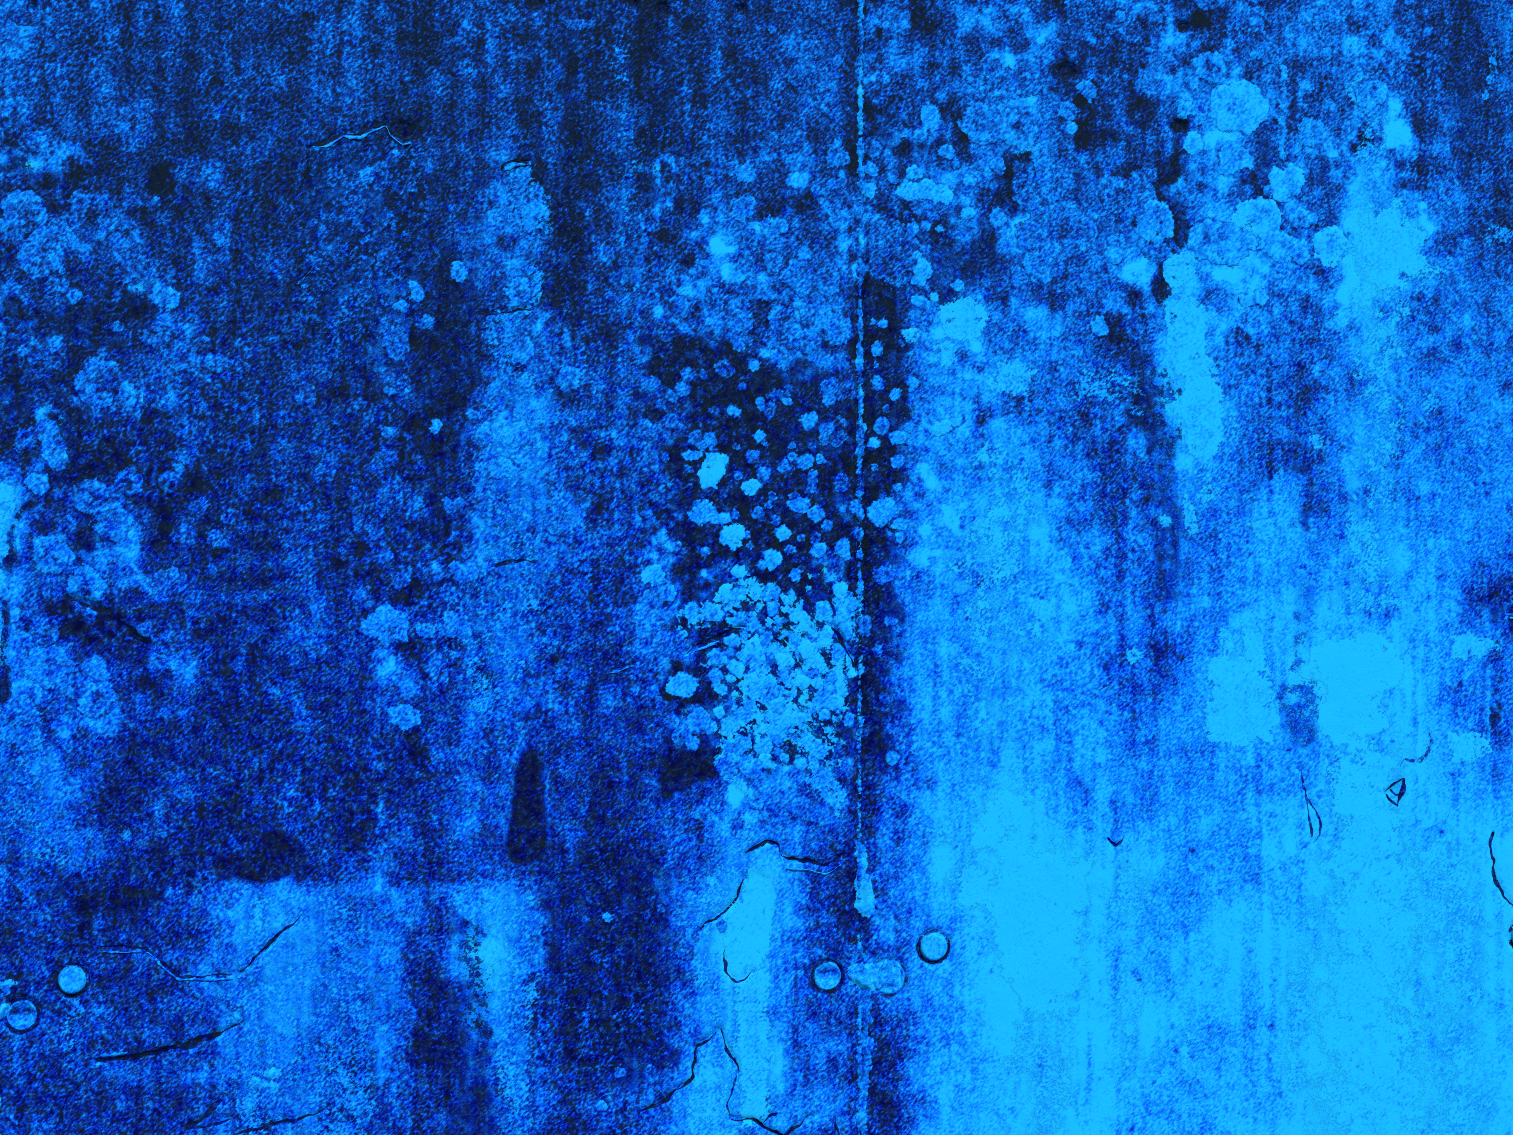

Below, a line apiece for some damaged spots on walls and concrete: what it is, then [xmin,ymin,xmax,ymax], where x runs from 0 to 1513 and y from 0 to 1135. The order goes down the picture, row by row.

water stain [1446,0,1509,140]
crack [298,121,415,193]
water stain [1482,225,1513,249]
water stain [0,379,105,489]
water stain [608,0,1038,804]
water stain [1060,115,1239,603]
water stain [73,508,100,565]
crack [1489,831,1513,905]
crack [100,916,300,981]
spalling [683,819,777,1135]
crack [59,1023,239,1122]
crack [186,1096,324,1134]